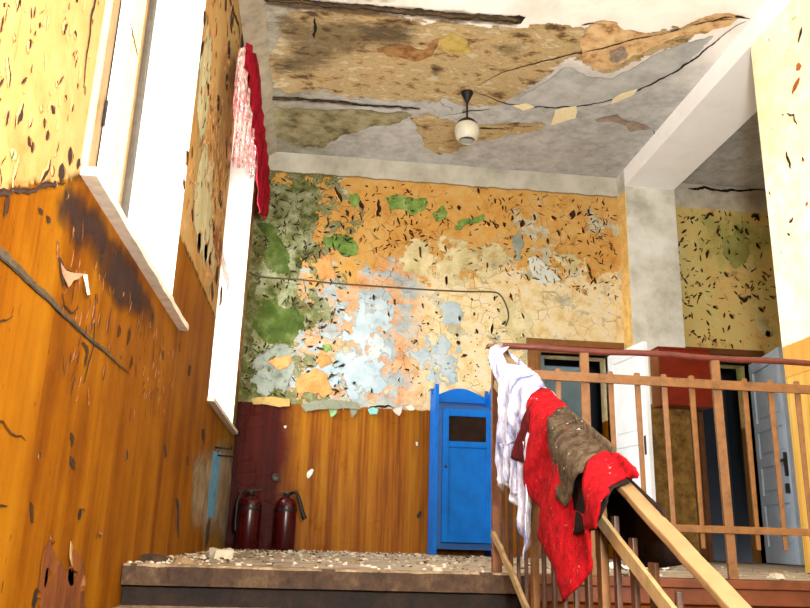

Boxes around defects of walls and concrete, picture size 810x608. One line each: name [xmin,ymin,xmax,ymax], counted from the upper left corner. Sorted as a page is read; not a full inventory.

peeling [0,64,36,153]
peeling [0,0,50,54]
peeling [40,76,81,199]
crack [272,97,421,110]
peeling [269,10,737,155]
crack [440,15,750,130]
crack [688,185,763,193]
peeling [779,16,802,96]
leakage [59,189,154,321]
peeling [238,177,618,417]
peeling [678,202,808,349]
peeling [32,534,86,608]